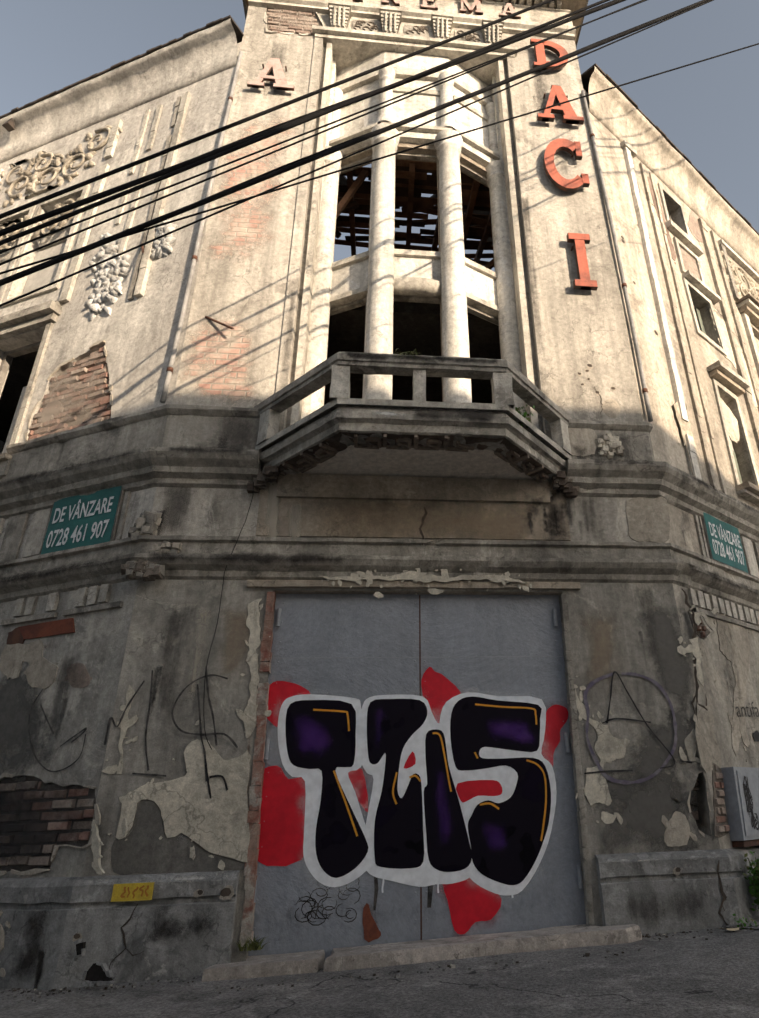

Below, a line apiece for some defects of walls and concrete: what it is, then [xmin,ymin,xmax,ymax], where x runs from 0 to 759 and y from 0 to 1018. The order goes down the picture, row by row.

flaking render [25,340,113,441]
crack [419,507,432,545]
peeling [319,568,532,598]
peeling [677,604,750,762]
peeling [0,598,271,884]
peeling [574,676,635,824]
peeling [661,704,730,847]
crack [109,904,144,968]
crack [717,860,728,926]